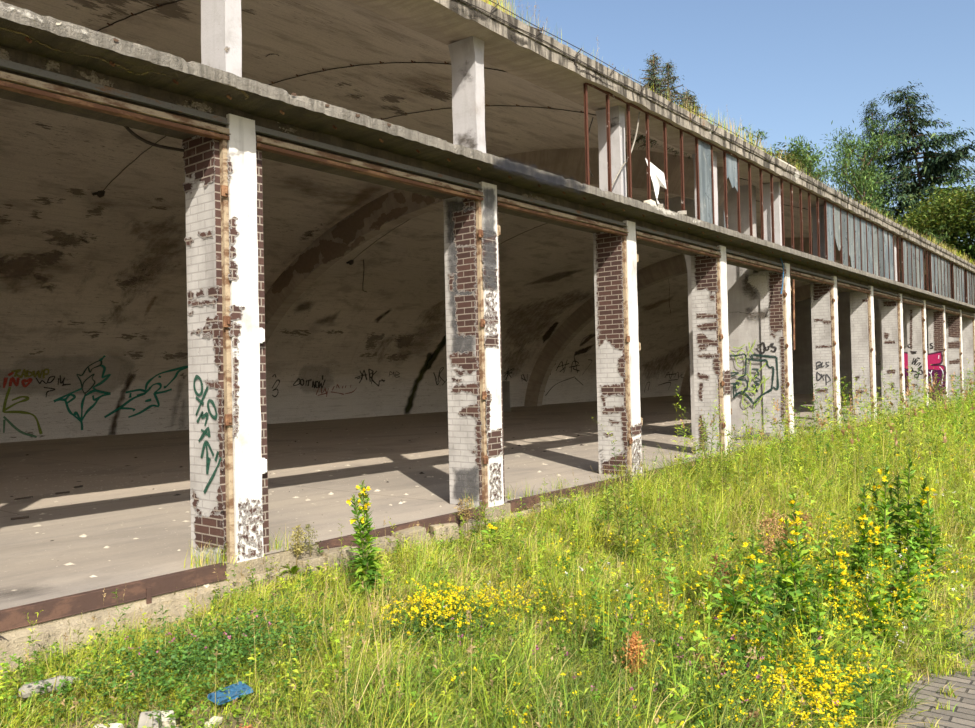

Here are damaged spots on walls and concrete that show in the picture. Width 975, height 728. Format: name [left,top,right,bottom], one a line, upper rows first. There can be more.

peeling [181,136,233,195]
leakage [0,230,96,290]
peeling [184,230,213,247]
peeling [228,216,239,281]
peeling [448,188,499,348]
peeling [694,255,718,301]
peeling [187,285,264,560]
peeling [449,351,503,502]
peeling [595,232,642,479]
peeling [696,313,731,450]